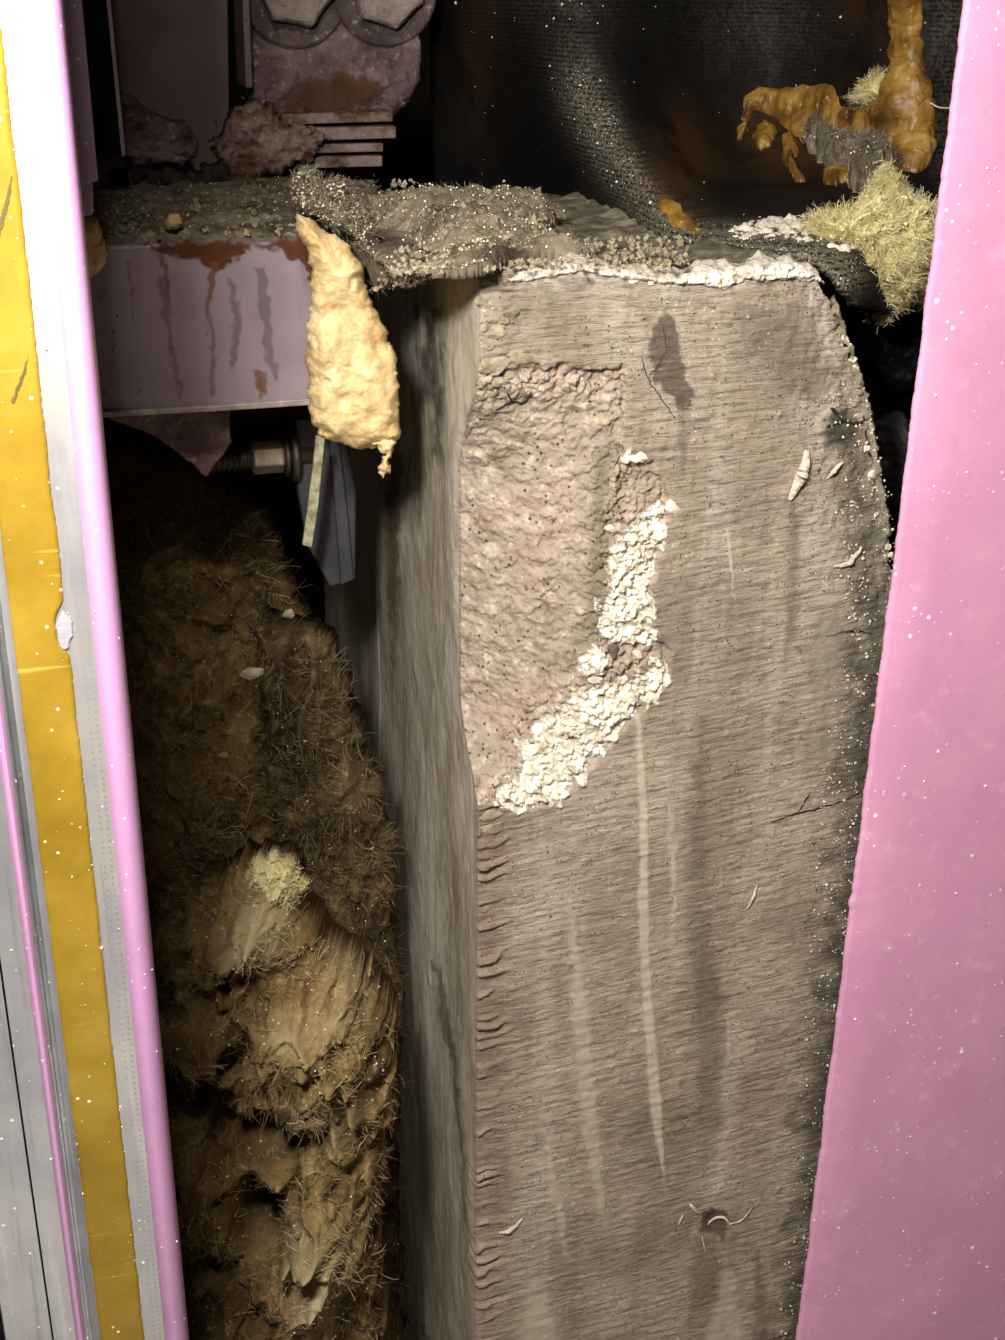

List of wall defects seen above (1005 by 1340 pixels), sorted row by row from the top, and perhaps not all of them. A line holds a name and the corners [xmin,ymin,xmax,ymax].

rust [207,71,381,179]
rust [151,236,313,314]
spalling [507,261,824,290]
rust [255,370,267,395]
leakage [650,315,693,408]
spalling [460,296,681,834]
leakage [666,799,678,912]
leakage [635,714,664,1172]
leakage [569,927,604,1208]
leakage [709,1276,741,1340]